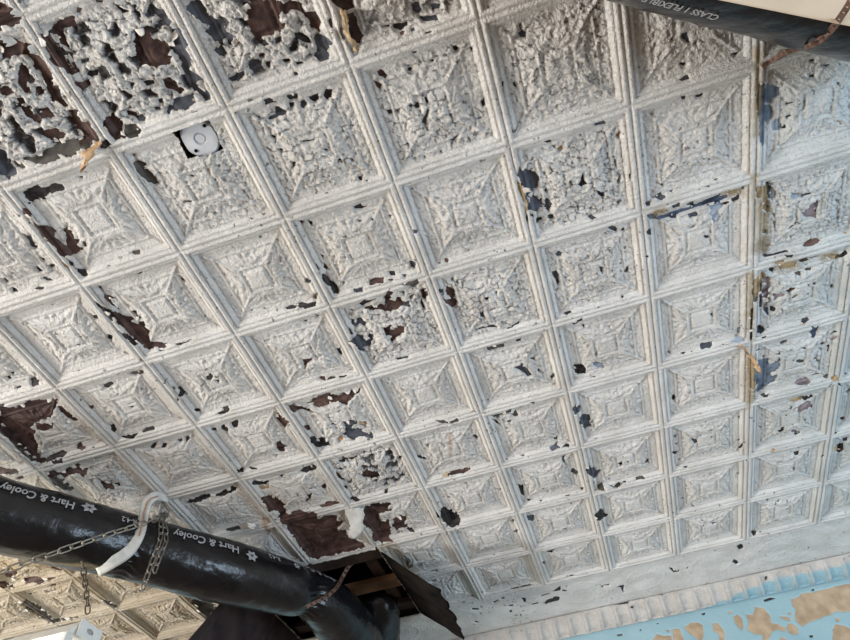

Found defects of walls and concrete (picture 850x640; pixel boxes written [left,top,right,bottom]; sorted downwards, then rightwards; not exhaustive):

peeling [0,2,146,180]
peeling [131,3,211,114]
peeling [186,0,238,56]
peeling [229,0,364,81]
peeling [18,183,88,290]
peeling [517,162,553,225]
peeling [93,286,192,351]
peeling [348,261,428,352]
peeling [722,249,819,397]
peeling [0,398,122,491]
peeling [274,388,360,427]
peeling [252,455,414,559]